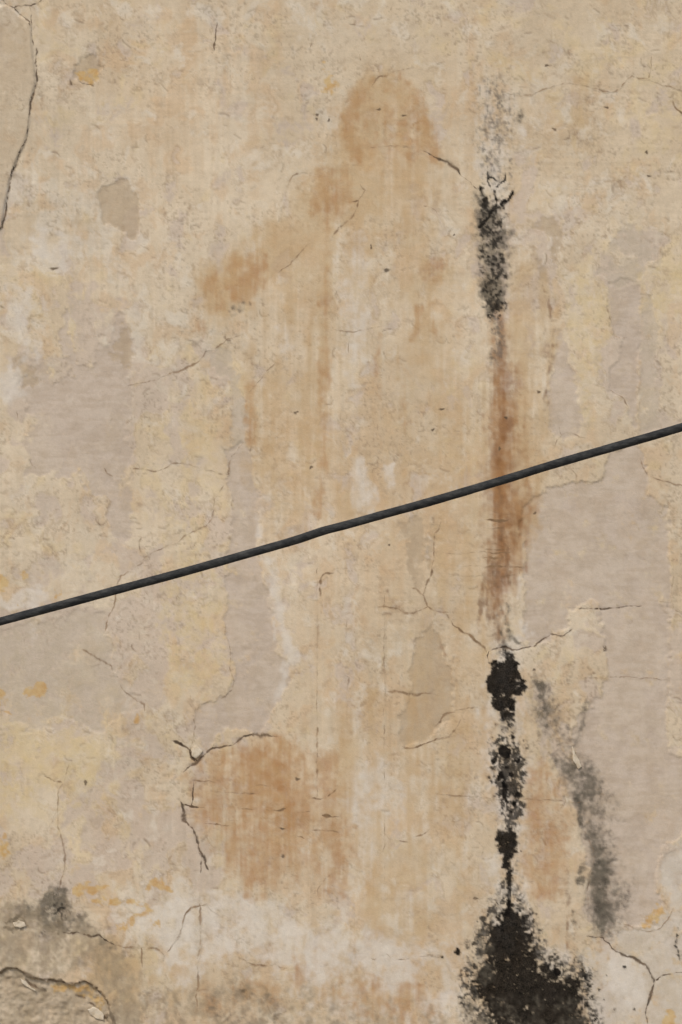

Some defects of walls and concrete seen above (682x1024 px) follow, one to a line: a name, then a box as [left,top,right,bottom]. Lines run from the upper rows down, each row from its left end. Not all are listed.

crack [0,0,42,230]
damp [187,56,618,549]
rust [474,284,558,650]
spalling [0,976,105,1021]
crack [171,569,339,873]
damp [19,492,667,1024]
crack [378,510,682,881]
crack [439,794,682,1024]
damp [673,927,682,961]